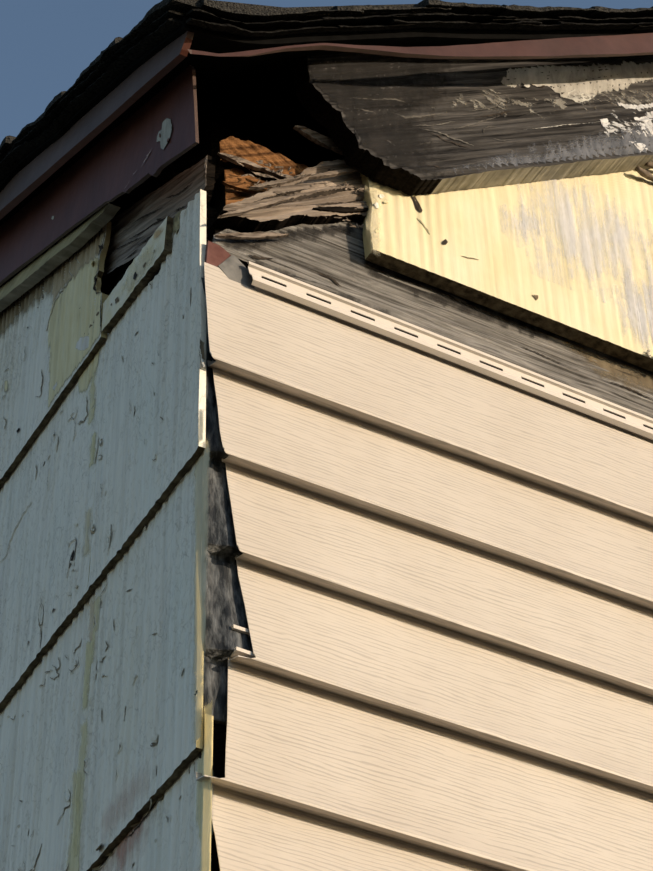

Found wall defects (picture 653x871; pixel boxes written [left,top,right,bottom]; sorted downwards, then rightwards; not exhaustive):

peeling [157,118,172,150]
peeling [452,61,653,152]
leakage [221,221,364,249]
peeling [46,228,112,425]
leakage [251,261,356,302]
leakage [365,260,552,340]
leakage [566,342,653,391]
peeling [65,510,95,578]
peeling [66,723,89,871]